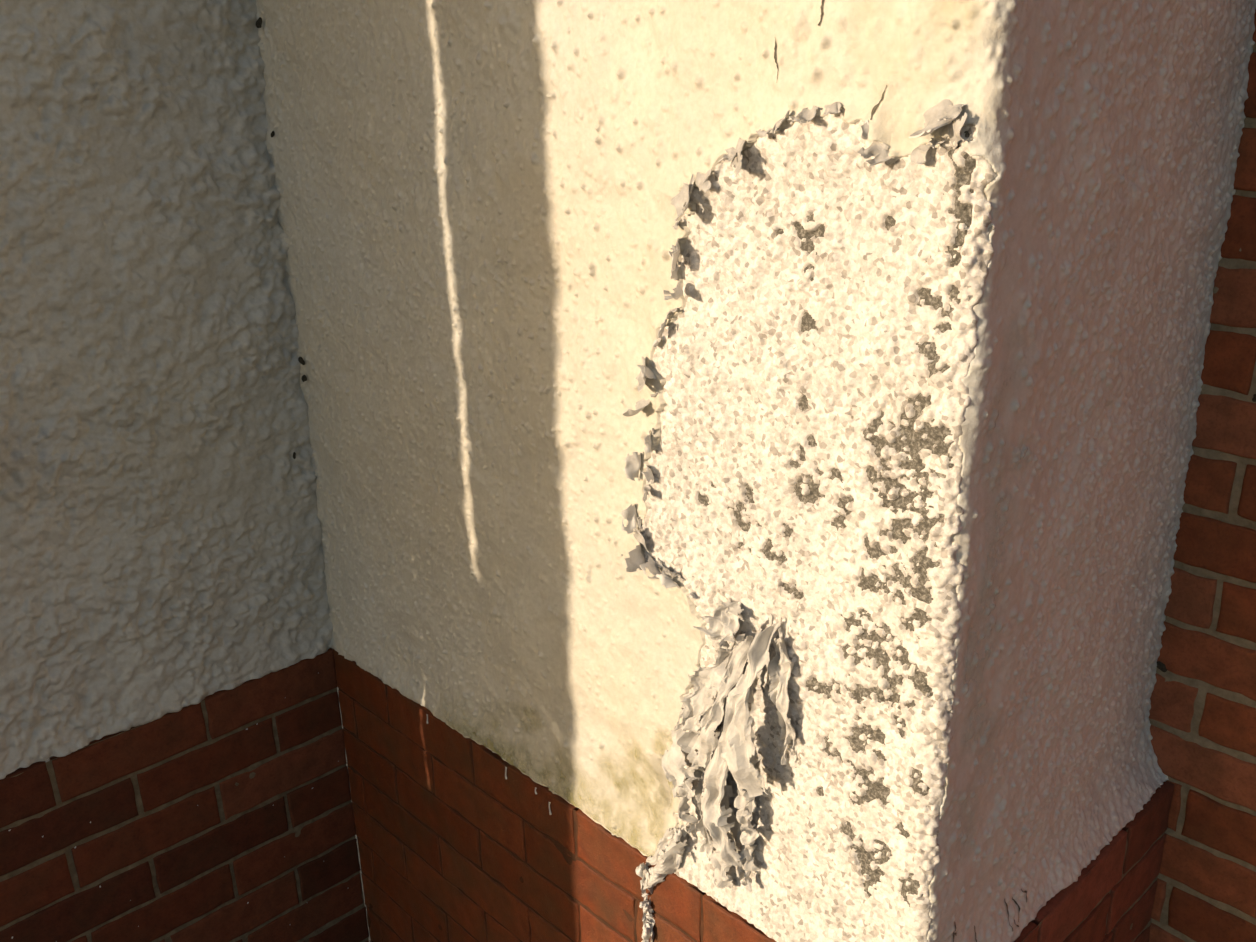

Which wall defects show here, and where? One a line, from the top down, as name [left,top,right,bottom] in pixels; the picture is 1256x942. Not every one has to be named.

crack [772,39,780,79]
crack [870,85,887,120]
peeling [620,102,997,942]